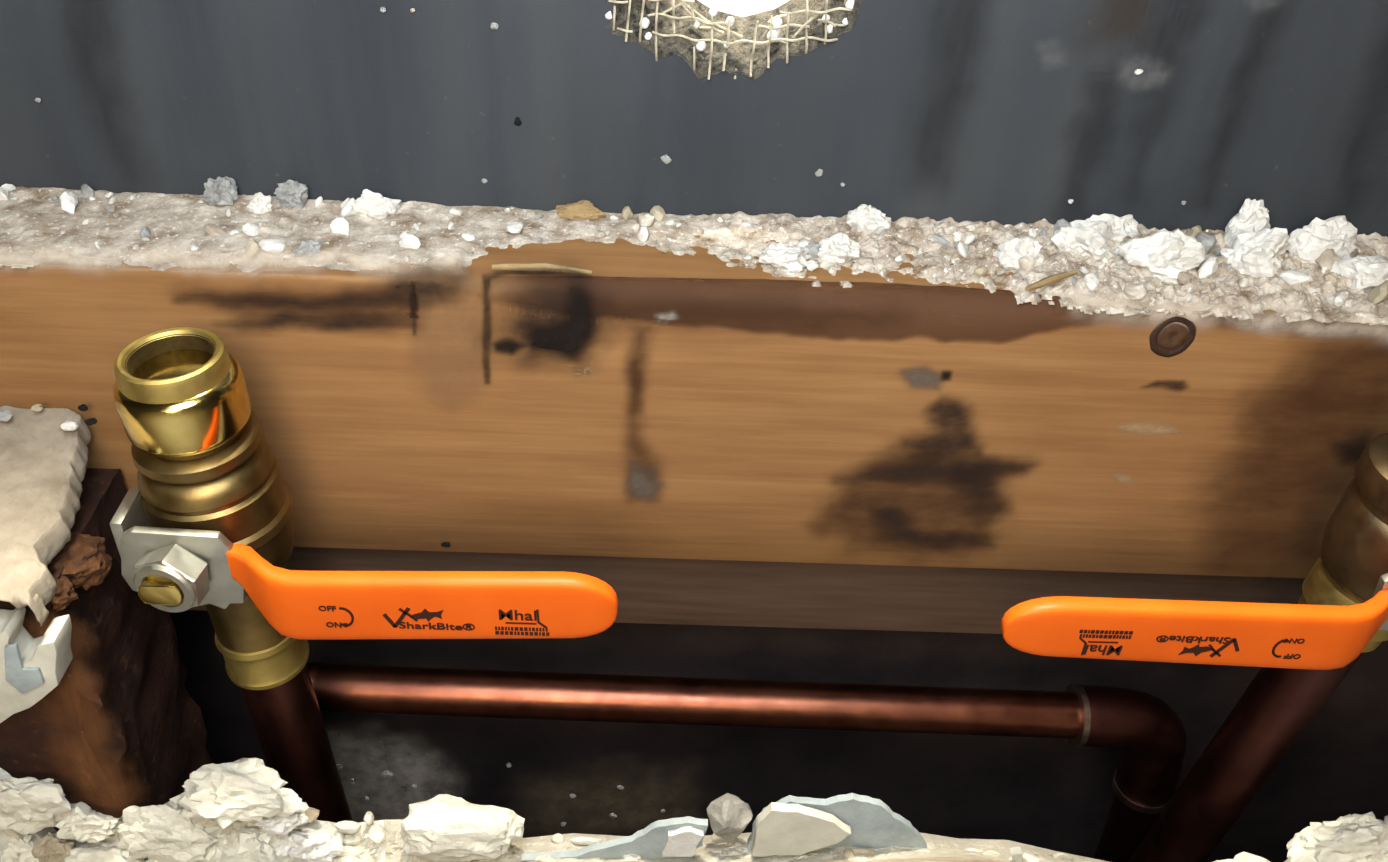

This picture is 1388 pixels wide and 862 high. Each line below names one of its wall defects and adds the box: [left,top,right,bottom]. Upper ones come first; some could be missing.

spalling [605,0,863,80]
leakage [495,282,595,357]
leakage [829,369,1024,548]
spalling [0,610,1261,862]
spalling [1205,640,1388,862]